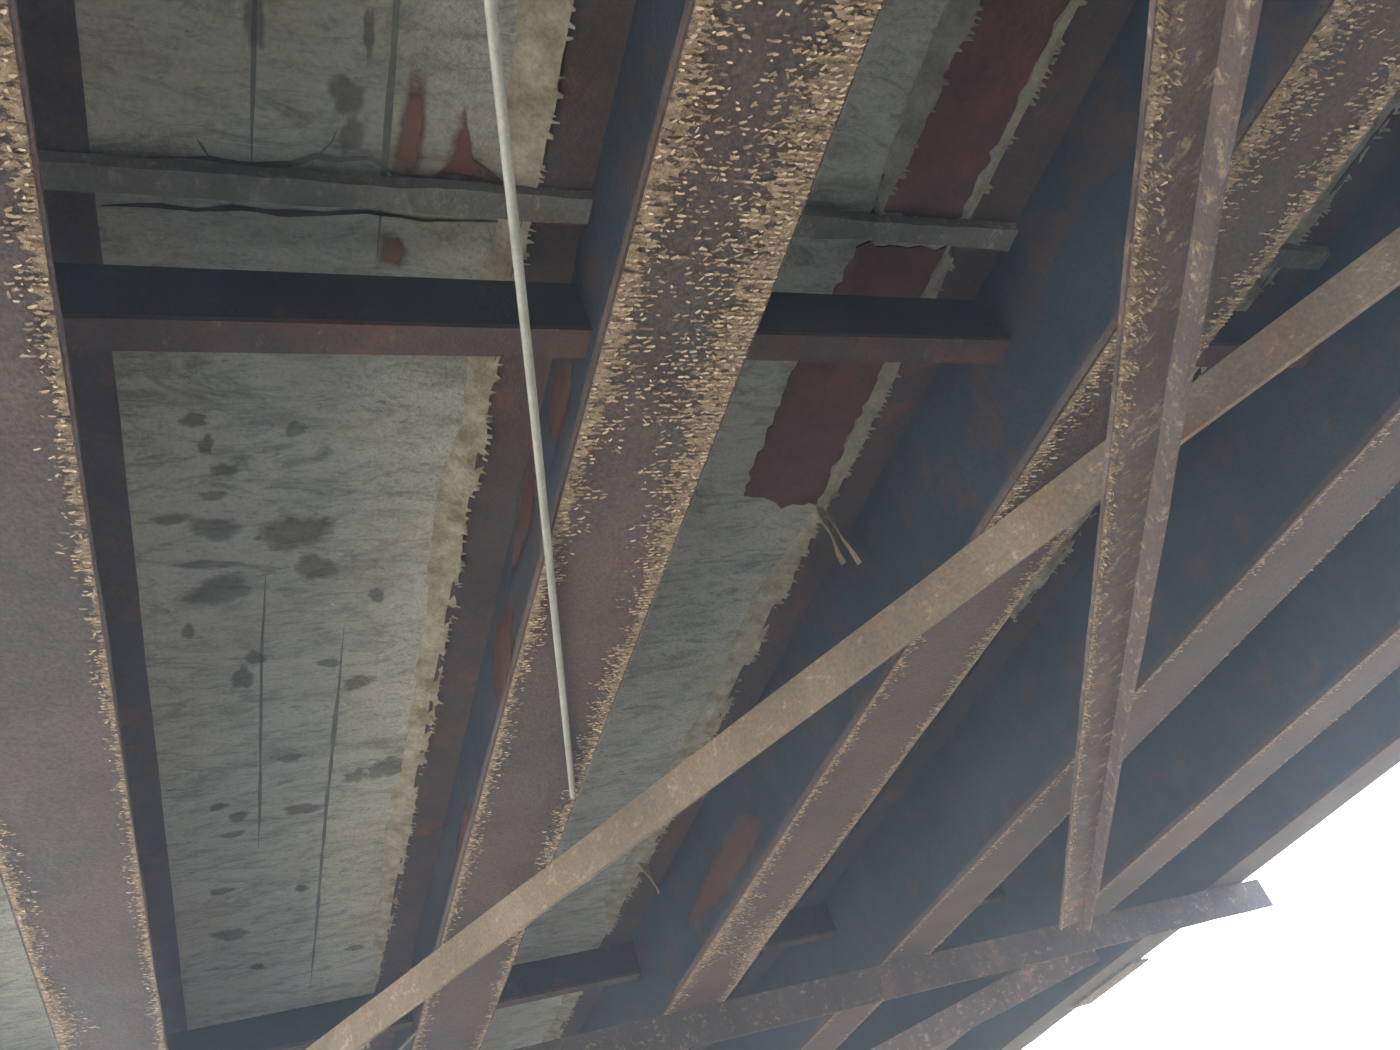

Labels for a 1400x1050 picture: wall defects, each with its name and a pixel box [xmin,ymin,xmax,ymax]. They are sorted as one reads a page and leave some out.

rust [395,79,425,172]
rust [437,112,501,181]
leakage [180,414,236,475]
leakage [154,515,234,539]
leakage [265,519,335,577]
rust [512,459,535,571]
leakage [182,560,245,604]
leakage [233,651,264,687]
leakage [348,676,371,690]
leakage [347,757,402,781]
leakage [212,804,247,838]
leakage [286,805,322,814]